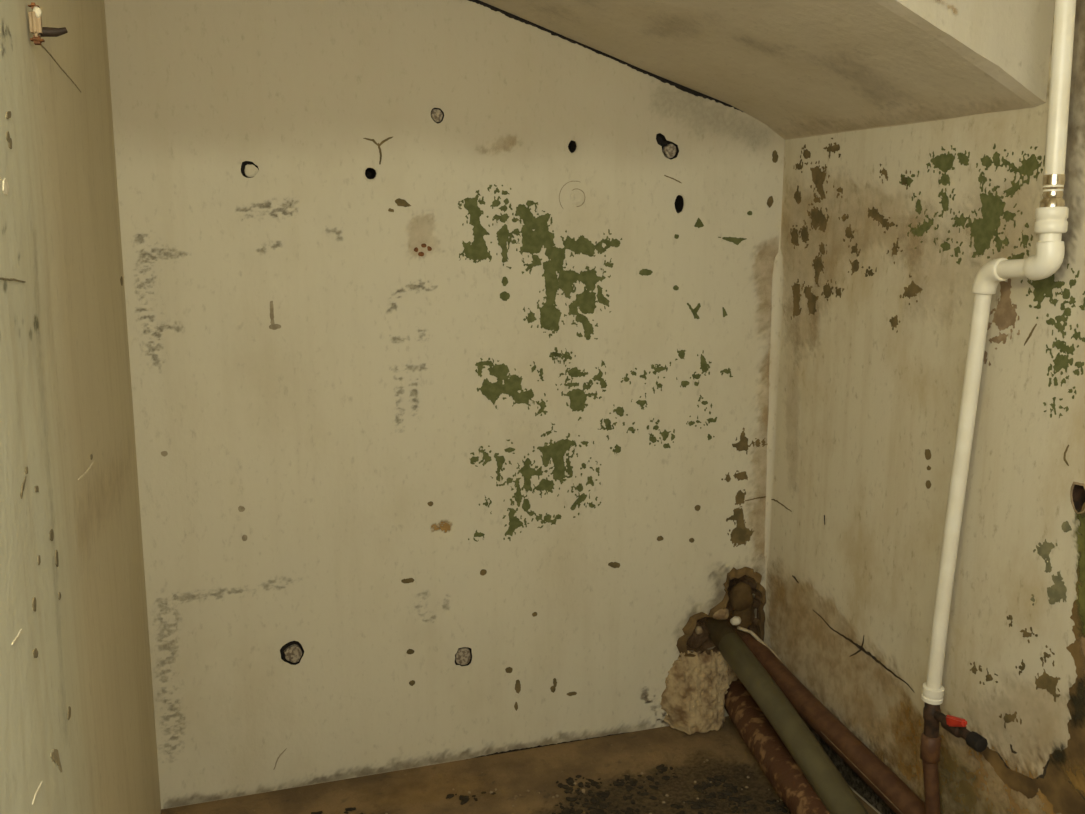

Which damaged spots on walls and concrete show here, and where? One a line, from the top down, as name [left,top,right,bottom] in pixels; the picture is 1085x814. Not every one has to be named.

peeling [718,237,747,245]
peeling [790,138,877,320]
peeling [868,144,1045,265]
peeling [900,274,923,305]
peeling [458,184,733,541]
peeling [983,264,1085,418]
peeling [732,427,767,454]
peeling [721,470,754,547]
spalling [676,567,766,658]
peeling [505,667,521,711]
peeling [970,662,998,685]
peeling [979,503,1085,814]